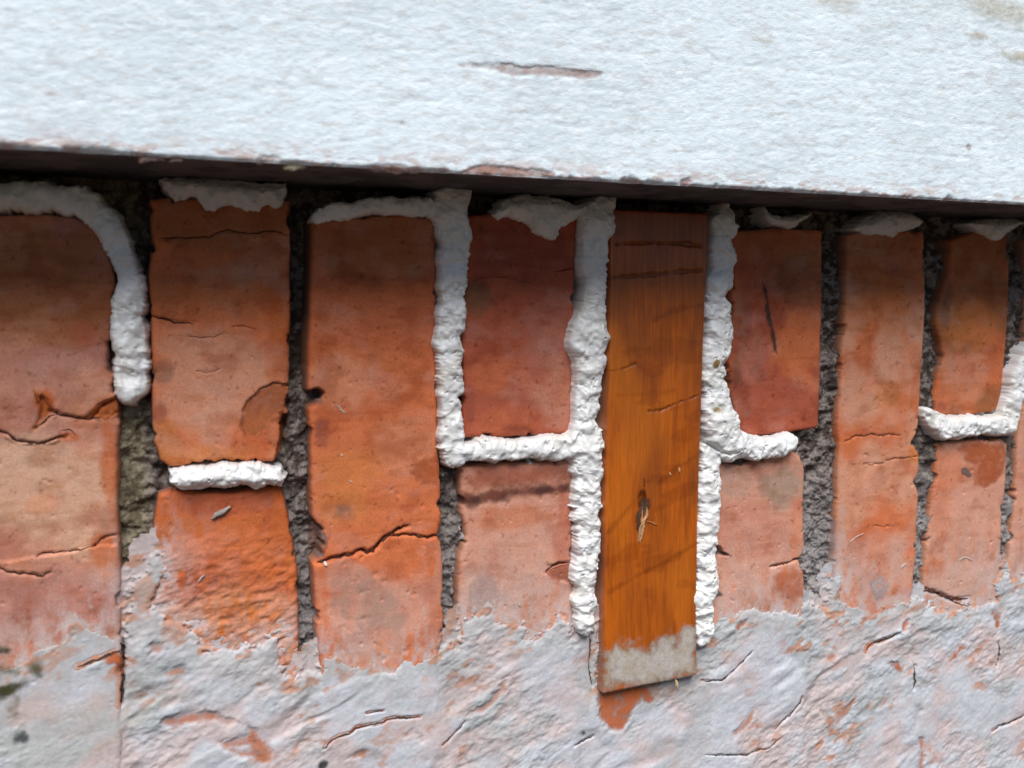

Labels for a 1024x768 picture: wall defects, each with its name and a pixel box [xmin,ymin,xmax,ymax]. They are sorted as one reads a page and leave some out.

crack [160,229,289,239]
spalling [34,391,51,424]
crack [0,404,120,444]
spalling [84,396,118,419]
spalling [241,382,289,442]
spalling [309,518,327,557]
crack [318,525,437,563]
spalling [546,564,569,580]
crack [866,633,898,650]
flaking render [99,650,123,672]
crack [325,710,418,748]
crack [707,700,801,756]